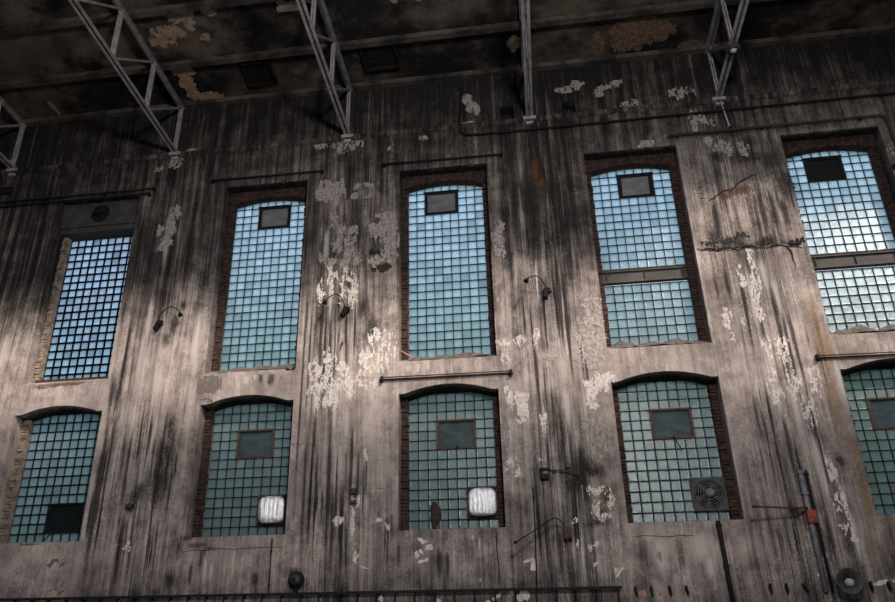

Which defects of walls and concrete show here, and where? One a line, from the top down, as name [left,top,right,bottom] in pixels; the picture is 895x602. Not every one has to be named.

peeling [315,178,400,309]
damp [508,171,560,228]
crack [700,174,756,202]
damp [85,302,177,577]
damp [190,316,201,375]
peeling [306,327,399,411]
peeling [504,386,547,436]
damp [535,260,589,378]
damp [522,297,602,565]
peeling [572,289,617,462]
peeling [760,335,823,429]
peeling [586,485,615,523]